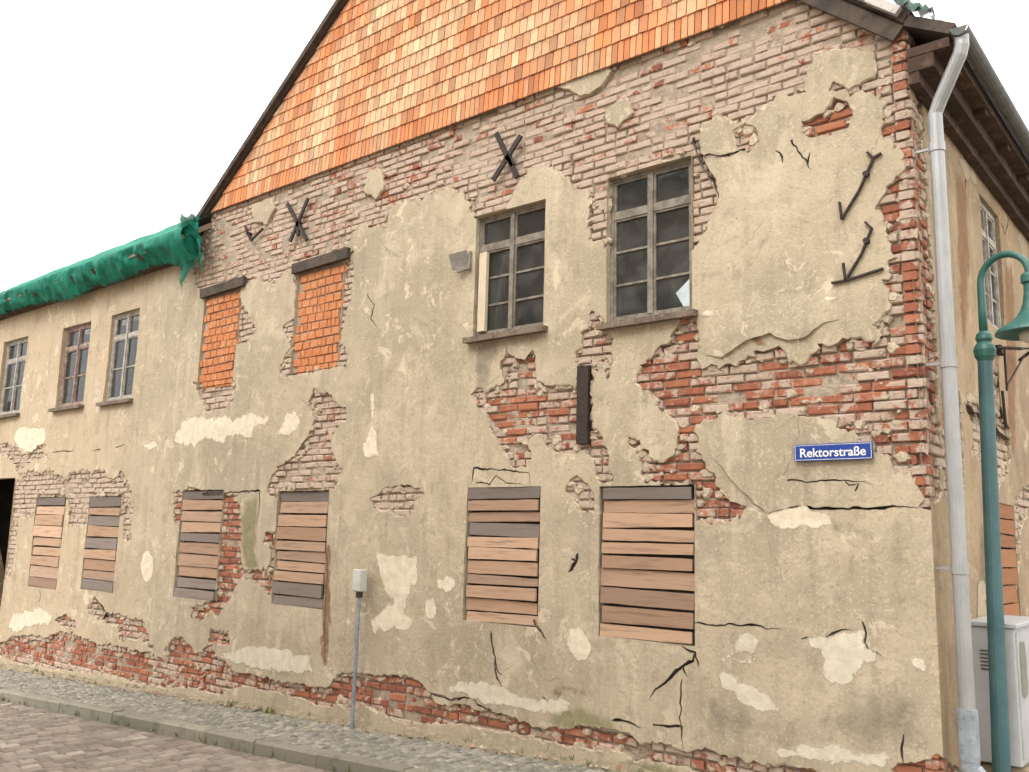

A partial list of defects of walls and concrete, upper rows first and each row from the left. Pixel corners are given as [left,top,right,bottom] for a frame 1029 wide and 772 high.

flaking render [959,157,977,185]
flaking render [173,0,948,529]
flaking render [1017,230,1027,258]
flaking render [958,385,981,489]
flaking render [993,364,1011,490]
flaking render [0,426,134,580]
flaking render [1013,485,1029,596]
flaking render [0,491,961,772]
crack [696,621,883,657]
flaking render [970,579,987,619]
crack [612,646,699,752]